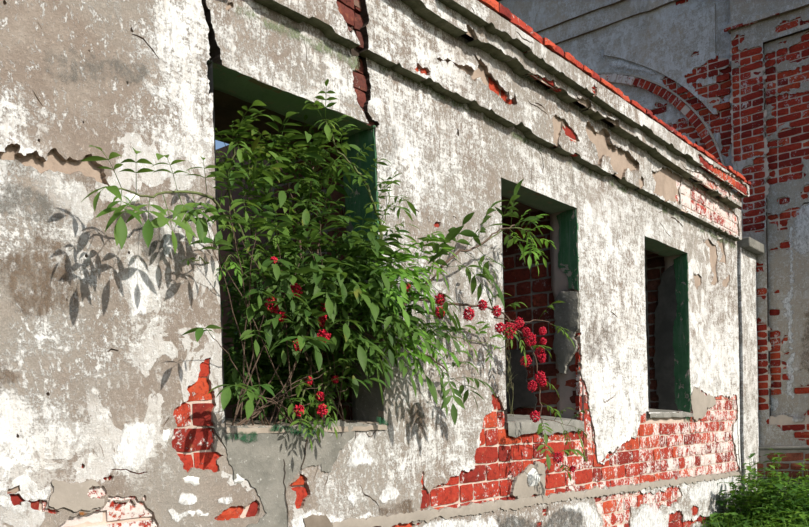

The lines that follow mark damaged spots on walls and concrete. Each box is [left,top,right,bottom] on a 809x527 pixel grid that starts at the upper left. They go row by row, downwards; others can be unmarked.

crack [336,0,375,126]
flaking render [457,54,518,105]
flaking render [528,74,561,92]
flaking render [0,145,104,184]
flaking render [552,115,577,149]
flaking render [585,13,809,287]
flaking render [756,287,780,300]
flaking render [757,309,809,446]
flaking render [172,358,222,472]
flaking render [420,333,739,527]
flaking render [7,469,157,527]
flaking render [290,475,308,508]